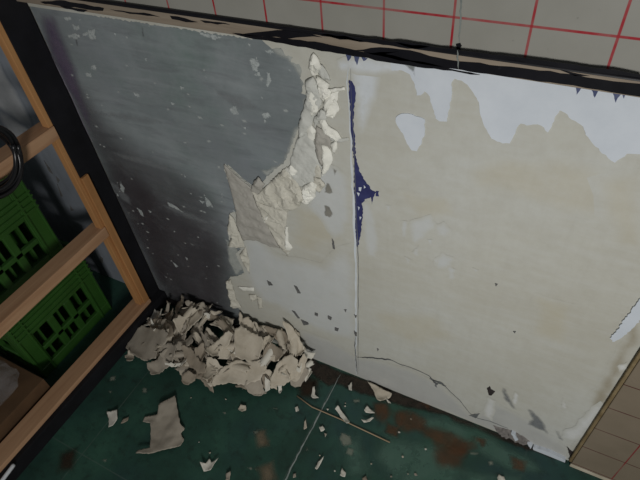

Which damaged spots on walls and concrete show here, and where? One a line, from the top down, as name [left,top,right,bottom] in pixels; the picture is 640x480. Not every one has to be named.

peeling [30,6,349,326]
crack [346,68,506,428]
peeling [391,63,640,162]
peeling [610,298,640,342]